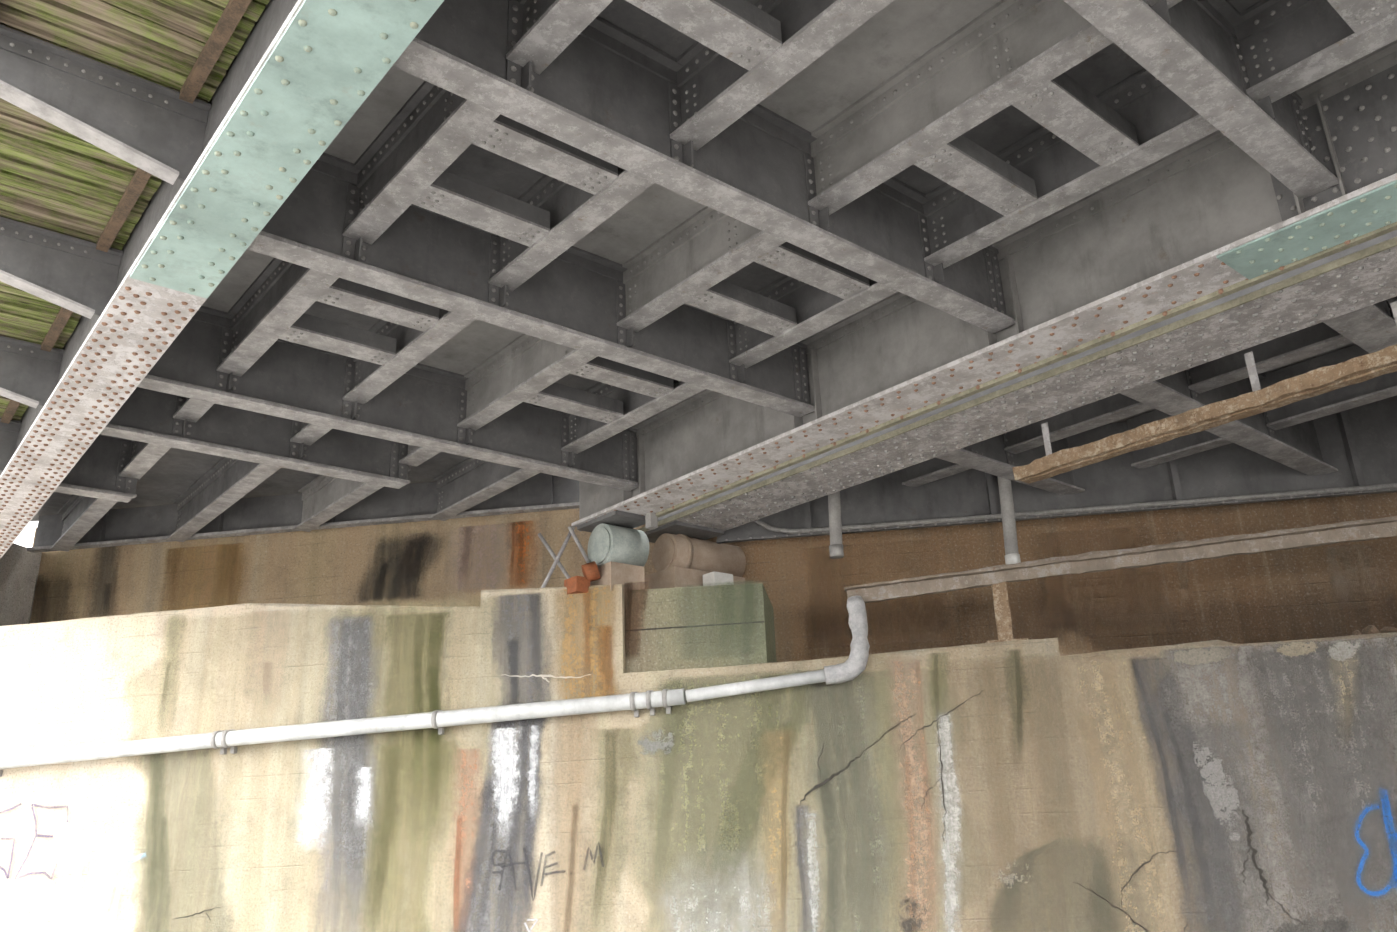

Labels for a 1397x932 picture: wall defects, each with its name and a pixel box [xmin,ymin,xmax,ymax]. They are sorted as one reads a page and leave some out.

leakage [360,537,438,600]
corrosion [512,521,532,584]
crack [799,690,983,841]
spalling [1192,741,1241,841]
leakage [1134,637,1397,932]
crack [1072,851,1175,932]
crack [1241,809,1308,925]